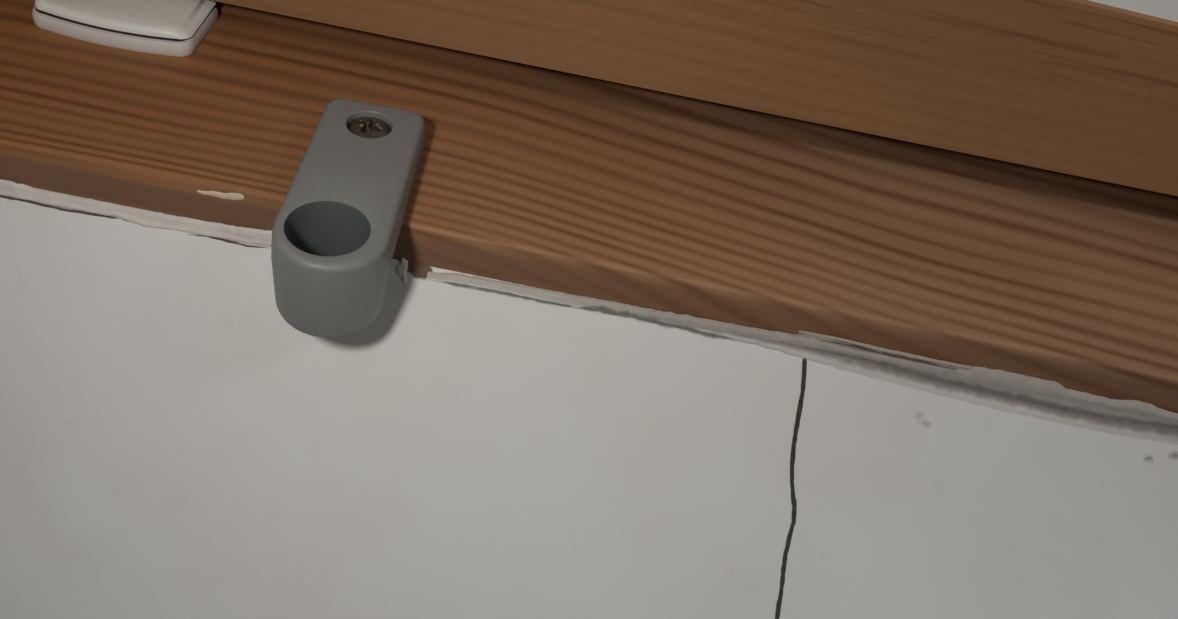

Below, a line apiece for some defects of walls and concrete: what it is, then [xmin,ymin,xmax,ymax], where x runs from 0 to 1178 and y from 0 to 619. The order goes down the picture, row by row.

crack [775,358,807,619]